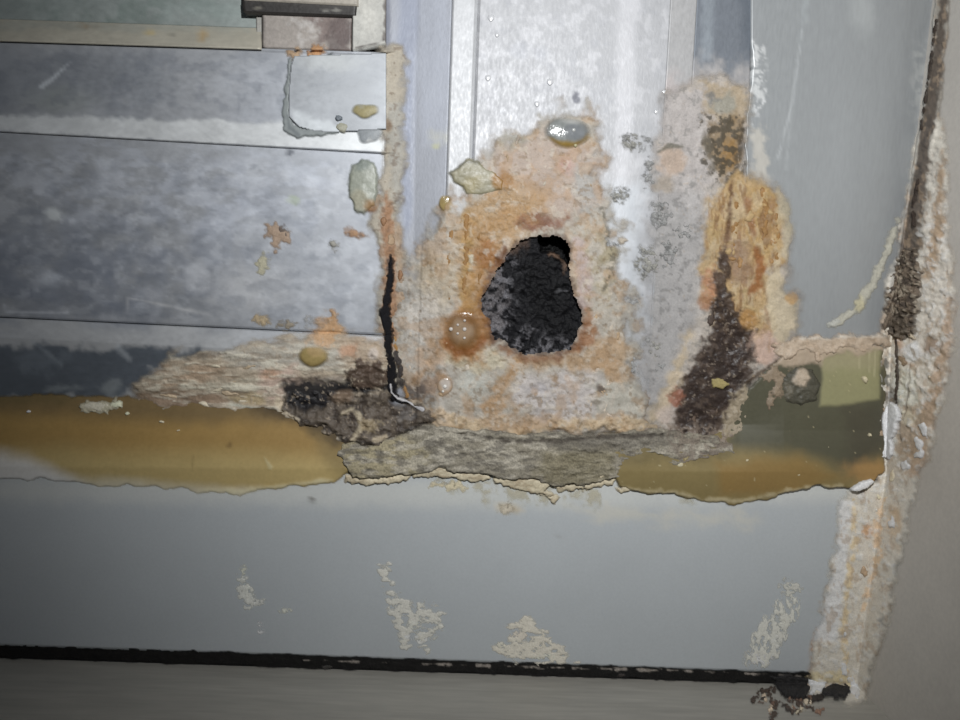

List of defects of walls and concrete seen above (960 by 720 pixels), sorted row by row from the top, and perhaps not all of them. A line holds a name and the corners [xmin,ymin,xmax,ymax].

crack [920,19,938,130]
rust [133,43,800,446]
water stain [610,187,629,203]
water stain [622,134,653,151]
water stain [643,160,656,184]
water stain [634,202,691,280]
crack [911,179,919,227]
crack [379,254,425,412]
spalling [337,425,735,504]
peeling [850,479,874,491]
peeling [880,389,927,482]
peeling [841,663,860,699]